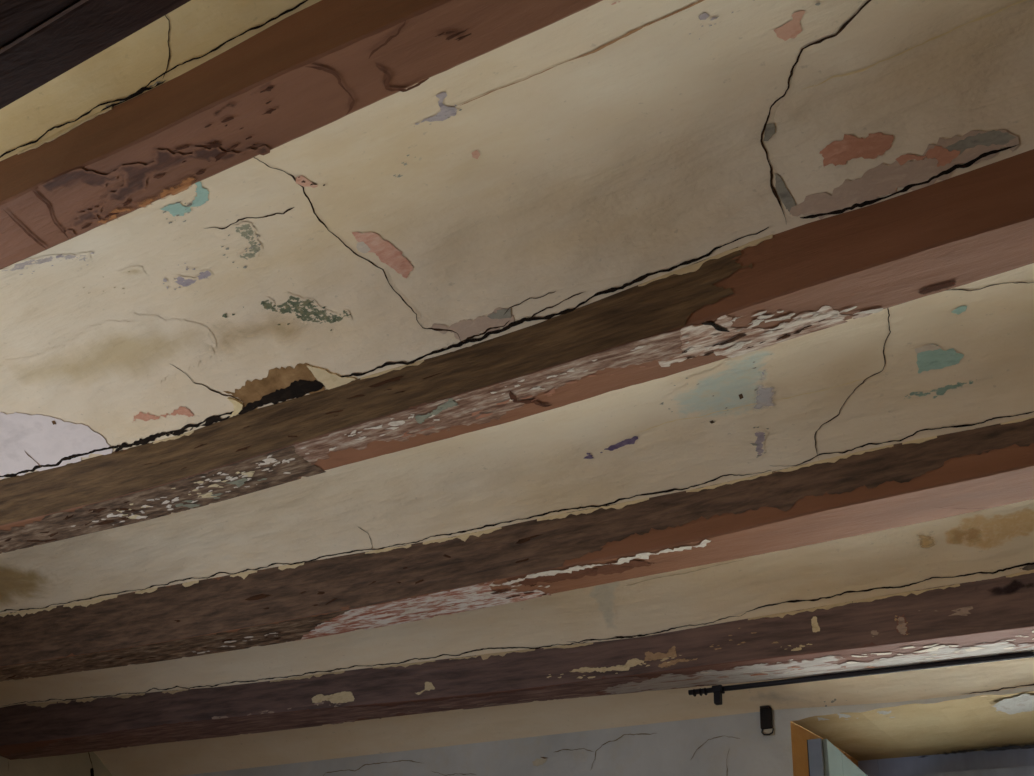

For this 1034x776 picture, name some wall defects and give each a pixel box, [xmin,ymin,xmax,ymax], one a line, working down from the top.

peeling [37,104,270,240]
flaking render [790,129,1019,219]
peeling [0,252,94,275]
peeling [163,263,213,290]
peeling [261,292,352,331]
crack [0,0,878,477]
peeling [919,281,956,294]
crack [946,282,1034,291]
peeling [0,306,883,554]
crack [0,308,1034,617]
damp [919,505,1034,552]
peeling [4,614,1034,759]